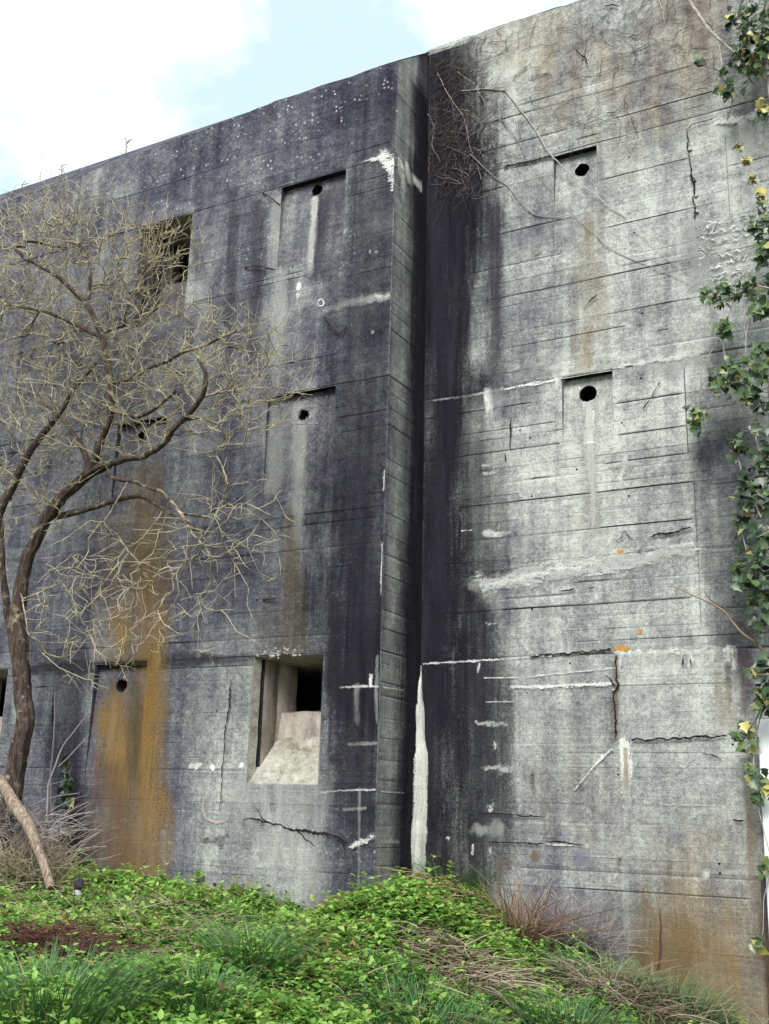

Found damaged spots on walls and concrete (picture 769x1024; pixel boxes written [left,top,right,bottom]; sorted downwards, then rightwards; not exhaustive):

spalling [364,149,422,193]
crack [686,115,717,220]
damp [295,42,737,885]
crack [616,527,692,542]
rust [94,611,174,877]
crack [219,683,231,811]
crack [605,655,727,762]
crack [243,811,348,858]